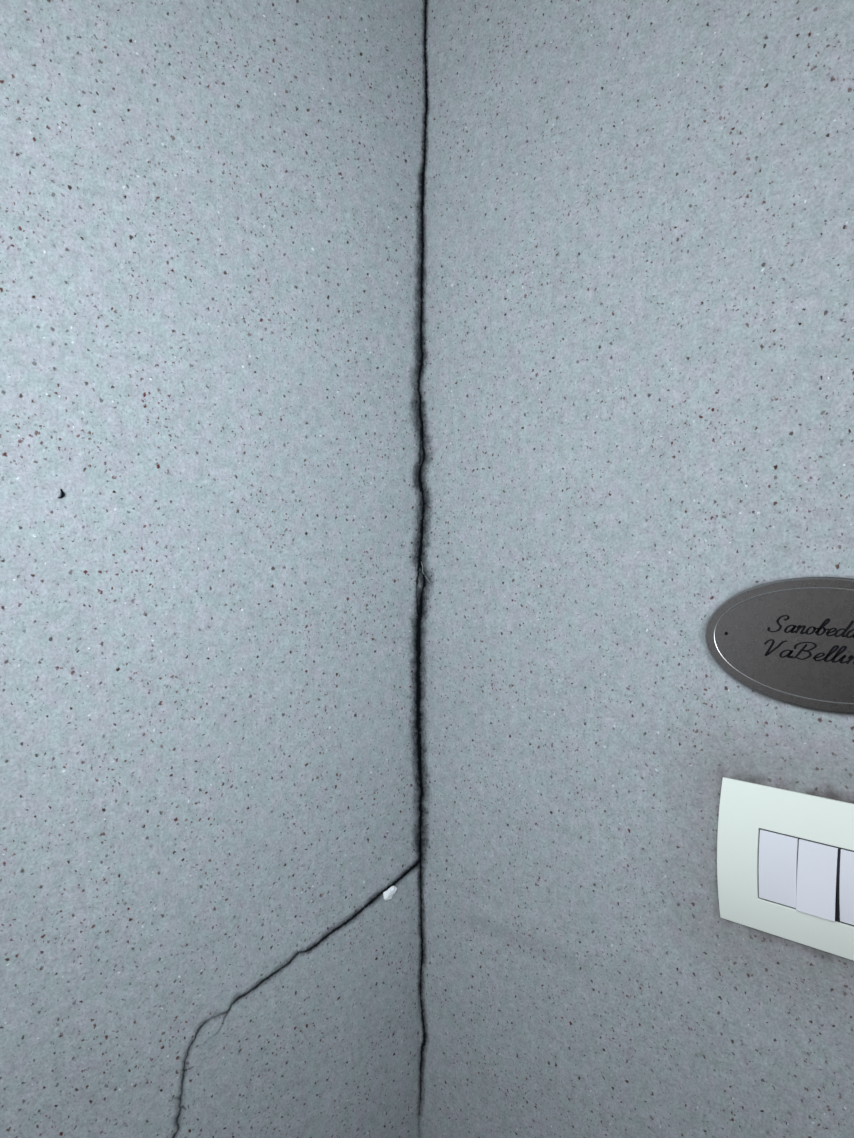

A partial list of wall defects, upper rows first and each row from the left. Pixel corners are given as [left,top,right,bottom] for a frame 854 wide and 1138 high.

crack [233,0,432,1112]